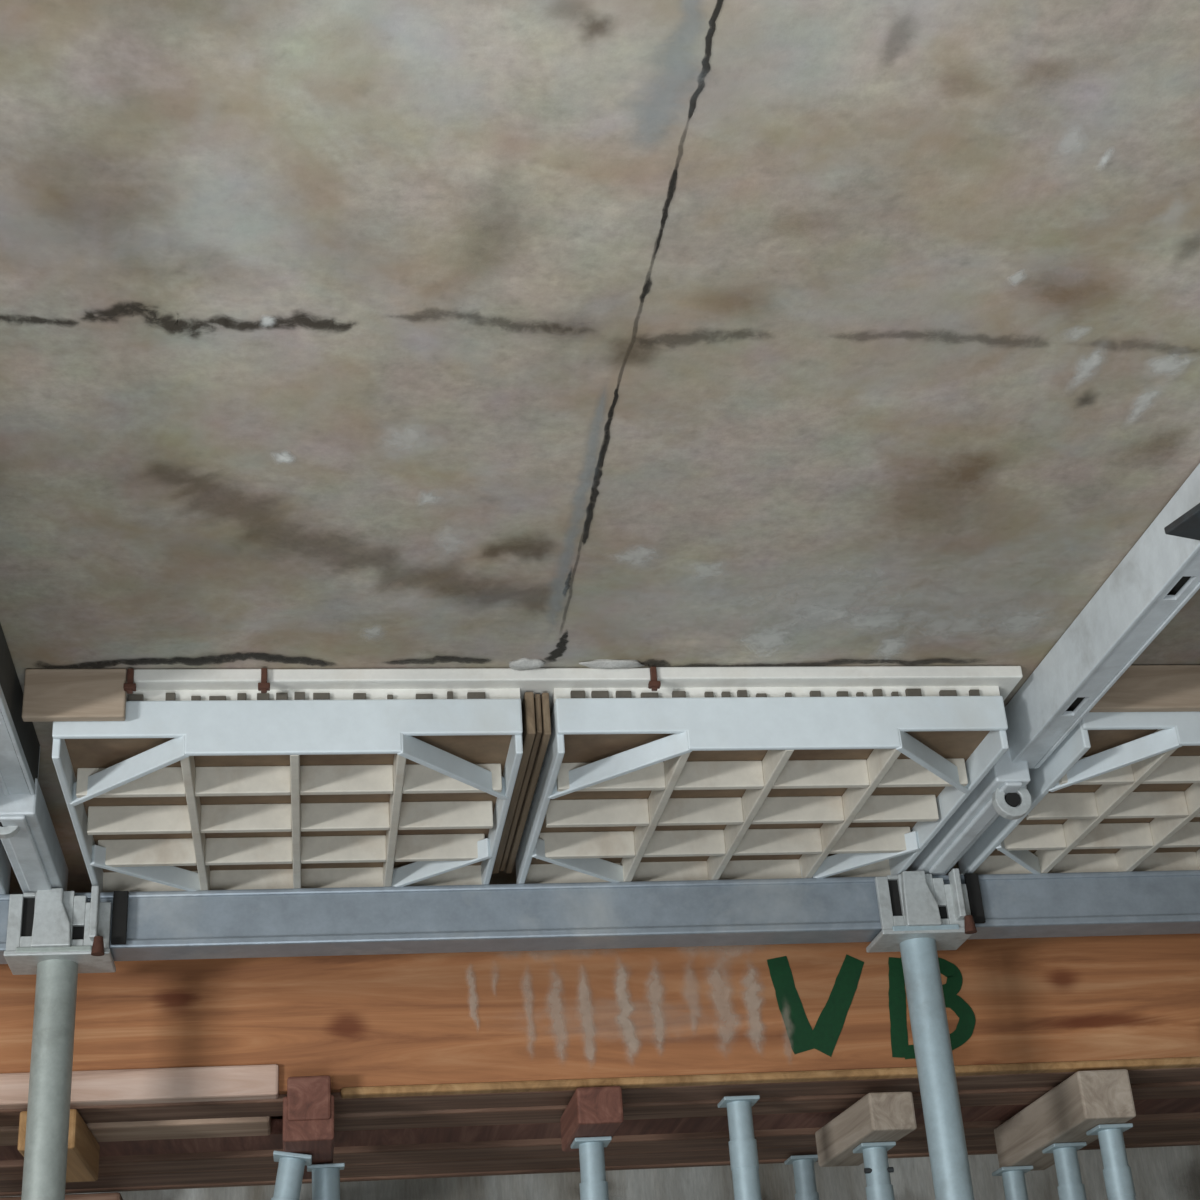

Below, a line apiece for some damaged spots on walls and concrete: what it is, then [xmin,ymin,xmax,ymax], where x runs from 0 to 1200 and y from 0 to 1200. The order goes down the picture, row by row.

crack [688,0,724,119]
crack [640,169,677,301]
crack [0,303,355,337]
crack [582,389,619,544]
crack [563,572,571,595]
crack [546,632,568,662]
damp [616,969,637,1053]
damp [746,970,762,1042]